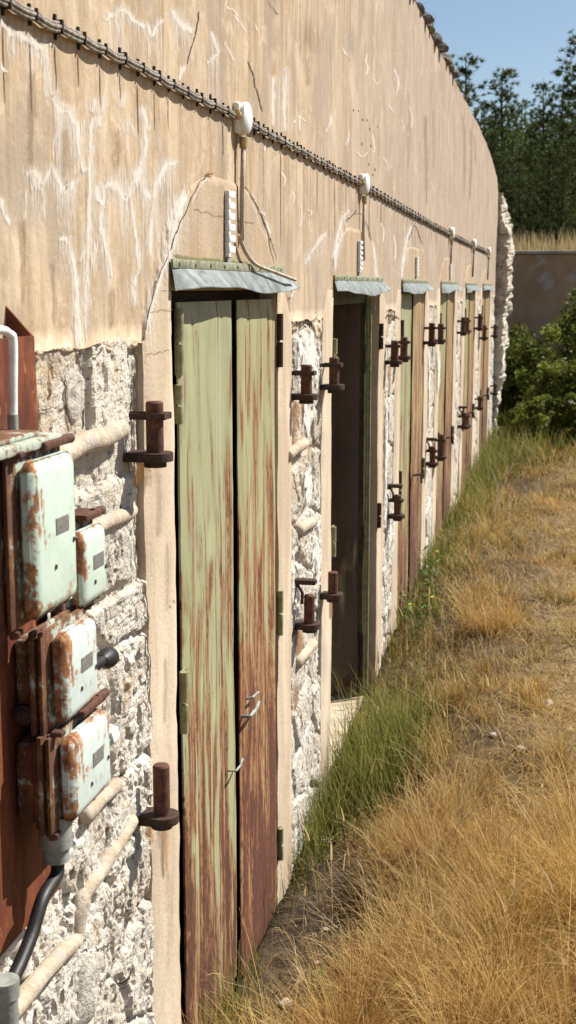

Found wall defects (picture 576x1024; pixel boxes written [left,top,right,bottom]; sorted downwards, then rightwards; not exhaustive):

crack [179,12,199,80]
leakage [270,69,289,131]
leakage [0,20,188,347]
leakage [304,210,350,269]
leakage [398,224,416,278]
spalling [35,337,138,360]
spalling [293,320,324,339]
crack [132,175,276,725]
peeling [303,404,313,439]